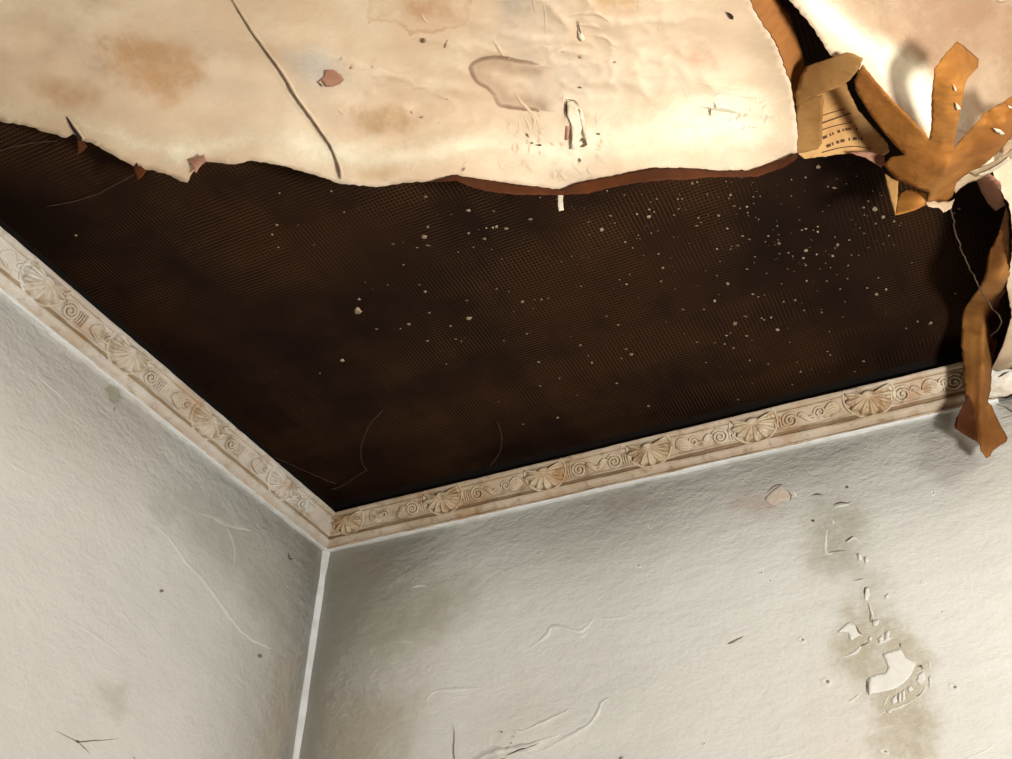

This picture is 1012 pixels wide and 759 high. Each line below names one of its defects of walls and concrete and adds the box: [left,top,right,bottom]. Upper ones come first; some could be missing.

leakage [905,0,994,57]
peeling [318,70,344,87]
peeling [562,93,600,162]
flaking render [988,369,1012,399]
peeling [824,502,868,563]
spalling [838,578,932,716]